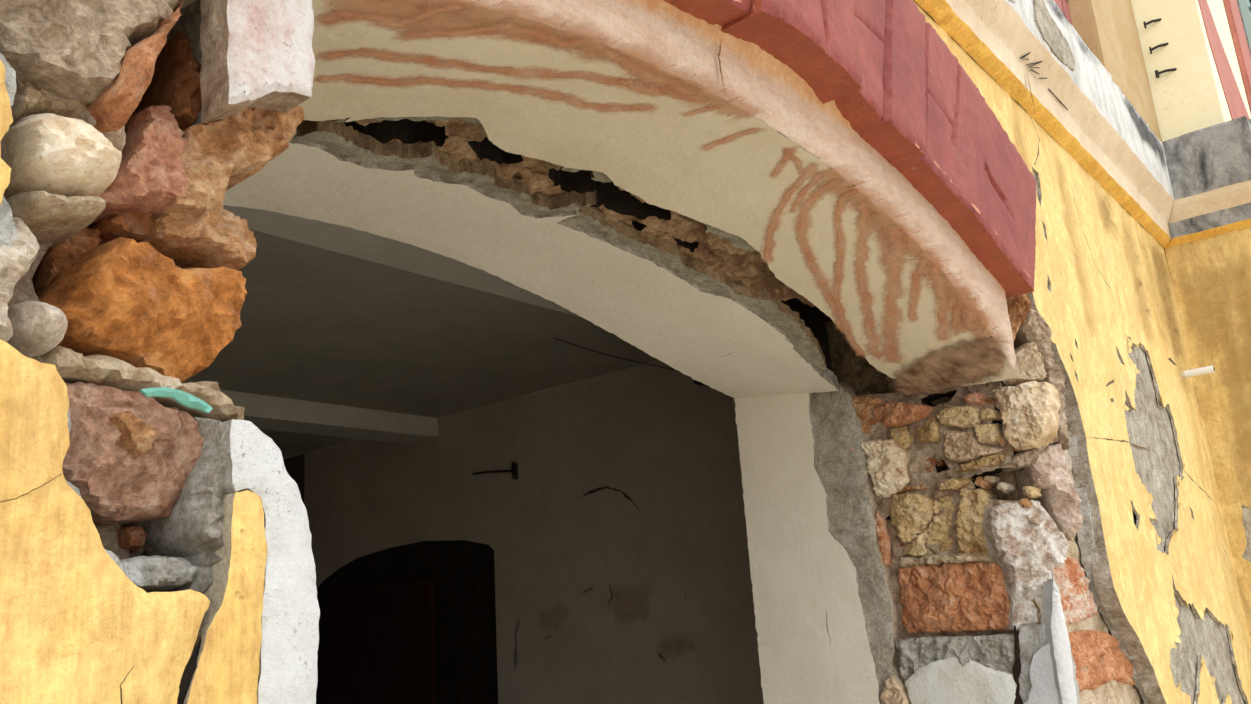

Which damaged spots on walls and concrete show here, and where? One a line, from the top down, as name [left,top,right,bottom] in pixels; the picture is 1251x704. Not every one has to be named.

spalling [0,0,305,594]
spalling [851,293,1136,704]
peeling [1106,338,1193,553]
peeling [1242,505,1251,562]
crack [177,636,202,704]
peeling [1170,591,1245,704]